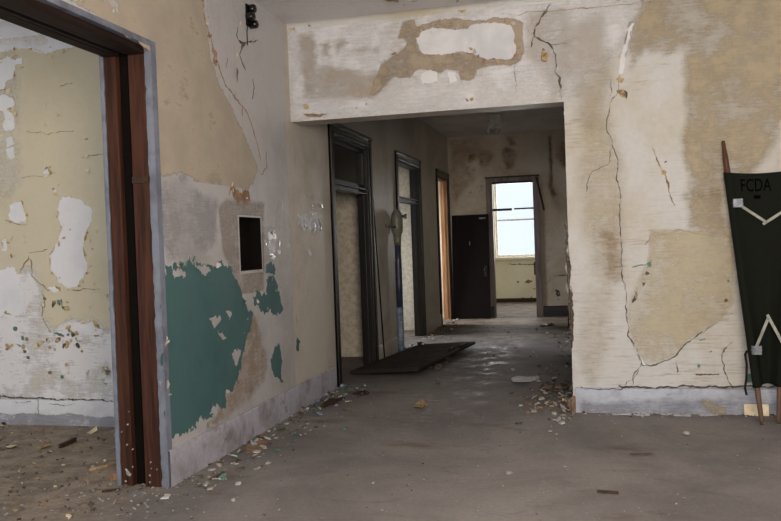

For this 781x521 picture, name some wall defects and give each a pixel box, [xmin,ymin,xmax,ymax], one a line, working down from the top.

peeling [0,35,77,162]
peeling [288,0,636,120]
crack [510,1,644,100]
peeling [0,236,30,317]
peeling [4,200,28,225]
peeling [42,184,98,319]
peeling [71,0,283,439]
crack [581,76,777,390]
peeling [5,319,103,359]
crack [0,395,114,422]